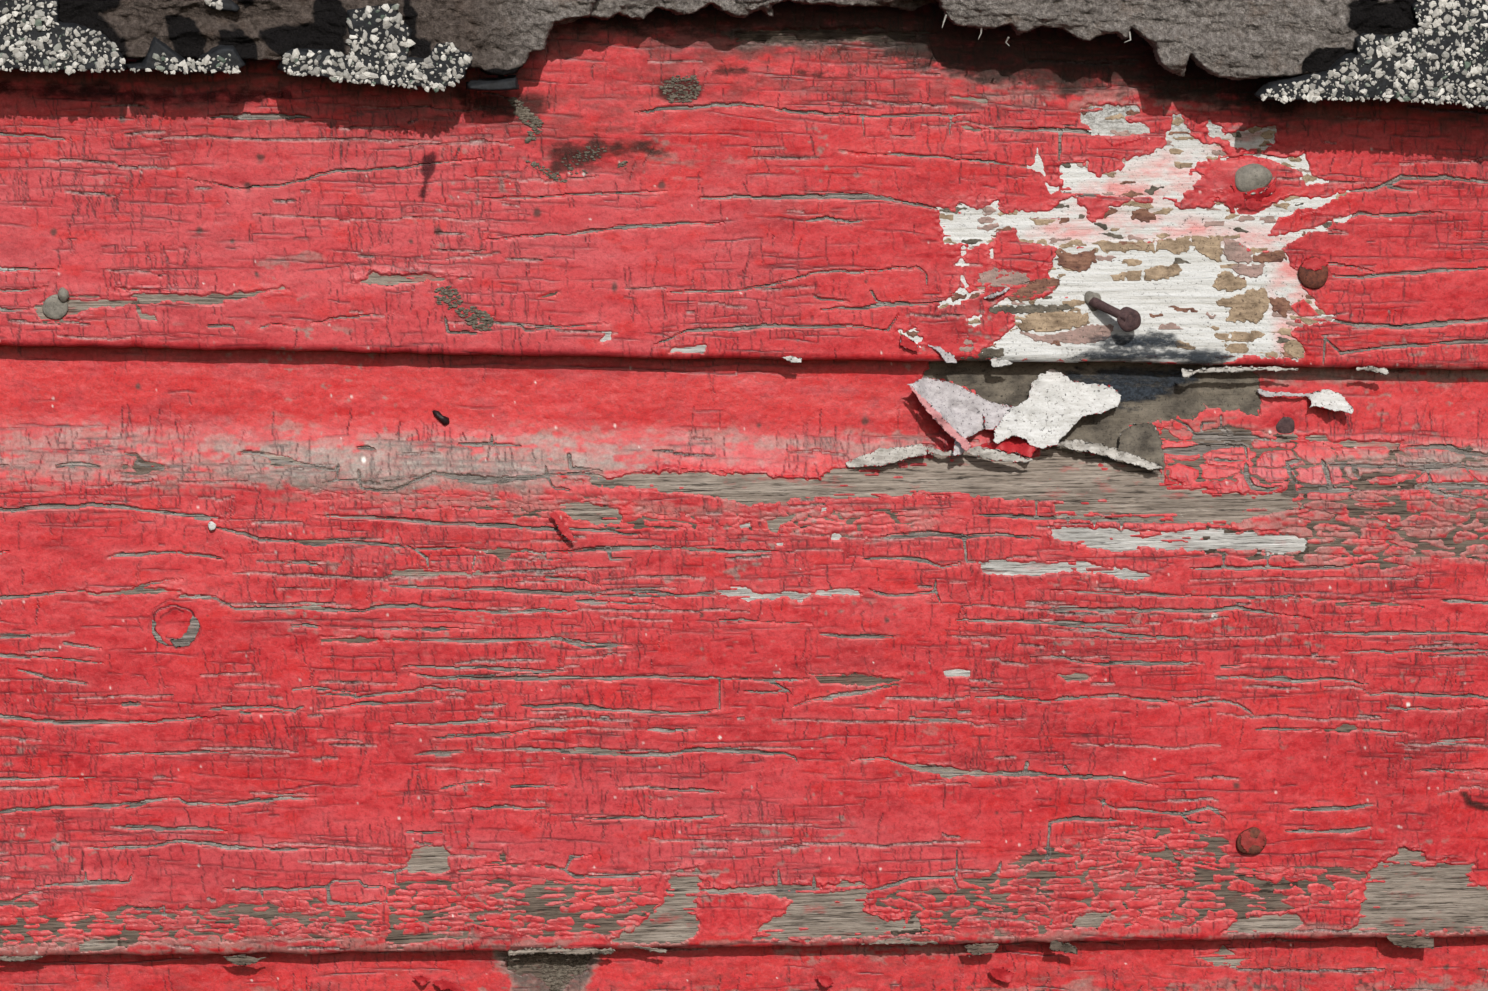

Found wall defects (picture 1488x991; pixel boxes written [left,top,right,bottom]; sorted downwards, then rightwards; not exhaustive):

crack [187,159,477,190]
crack [485,192,937,240]
crack [637,102,1124,197]
crack [1349,174,1488,219]
crack [444,318,595,335]
crack [658,266,942,345]
peeling [292,95,1488,588]
crack [1323,319,1488,364]
crack [1328,262,1488,279]
crack [1161,410,1488,501]
crack [0,435,1488,920]
peeling [0,826,1488,991]